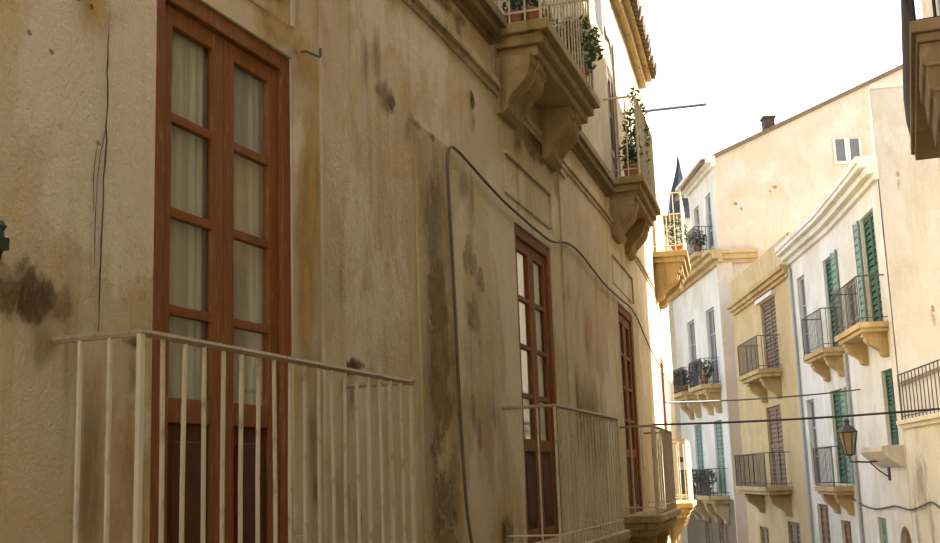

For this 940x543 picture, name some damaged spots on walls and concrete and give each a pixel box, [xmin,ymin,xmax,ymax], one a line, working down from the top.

damp [376,81,396,111]
crack [93,11,110,331]
damp [0,258,71,356]